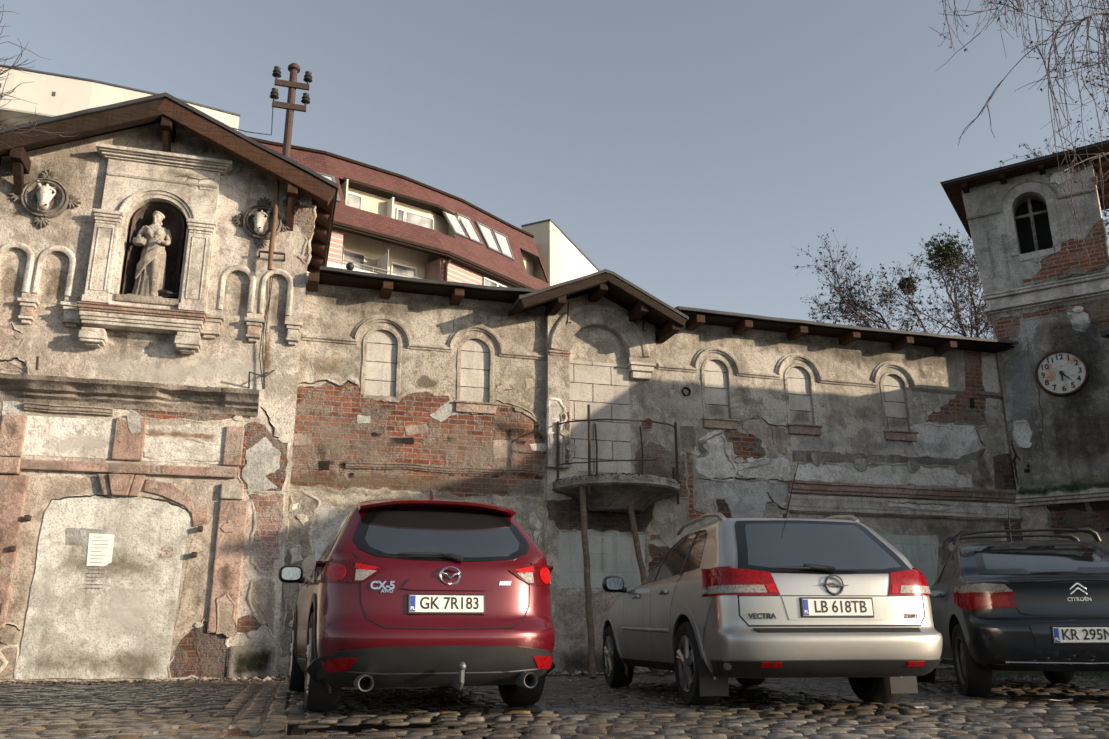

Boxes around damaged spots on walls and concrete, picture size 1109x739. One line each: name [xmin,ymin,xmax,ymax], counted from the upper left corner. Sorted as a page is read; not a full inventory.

flaking render [1021,218,1109,287]
flaking render [127,350,1016,680]